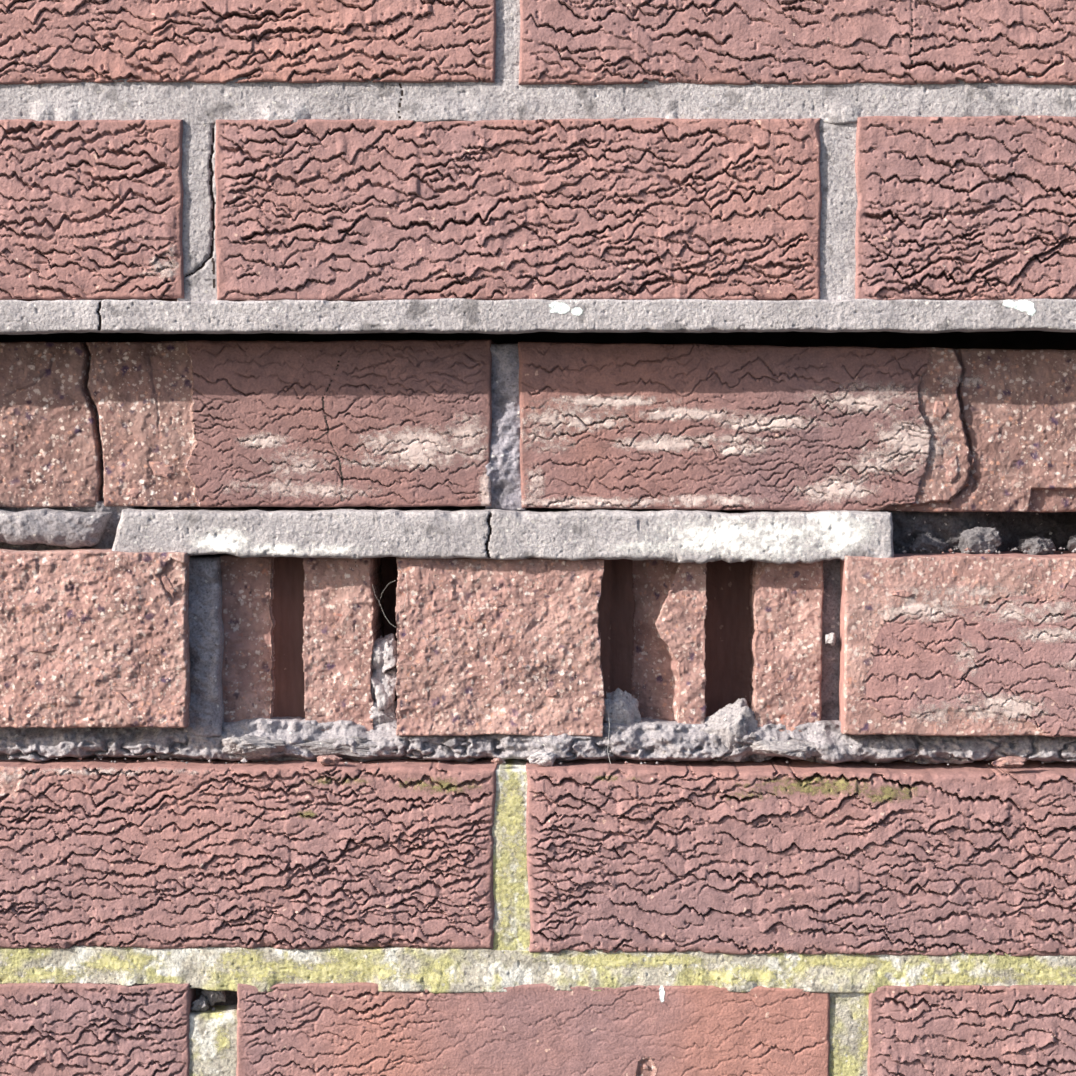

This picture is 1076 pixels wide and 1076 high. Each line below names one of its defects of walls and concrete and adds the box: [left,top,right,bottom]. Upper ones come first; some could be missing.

spalling [0,341,201,508]
leakage [225,432,365,497]
leakage [346,414,487,470]
leakage [480,472,491,506]
leakage [521,375,986,560]
spalling [220,556,276,722]
spalling [302,557,606,737]
spalling [631,559,708,724]
spalling [748,560,824,732]
leakage [0,768,139,781]